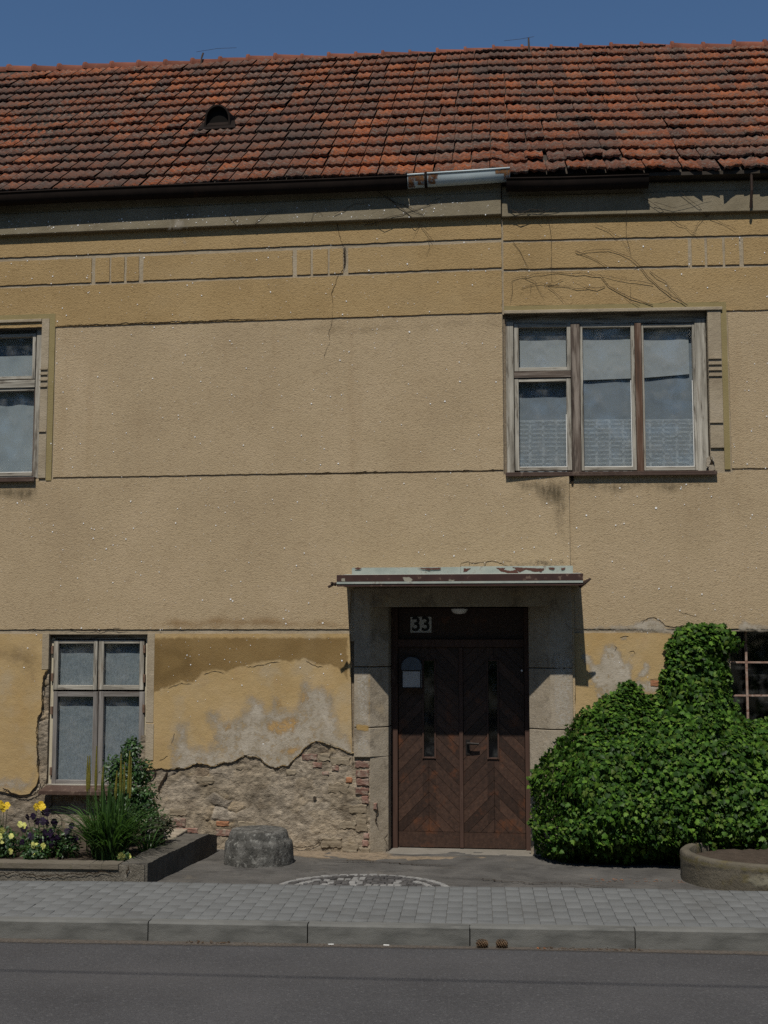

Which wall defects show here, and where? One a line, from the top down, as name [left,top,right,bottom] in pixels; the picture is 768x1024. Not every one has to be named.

peeling [154,637,347,691]
peeling [582,619,674,710]
peeling [739,621,765,631]
spalling [0,669,108,829]
spalling [139,682,377,853]